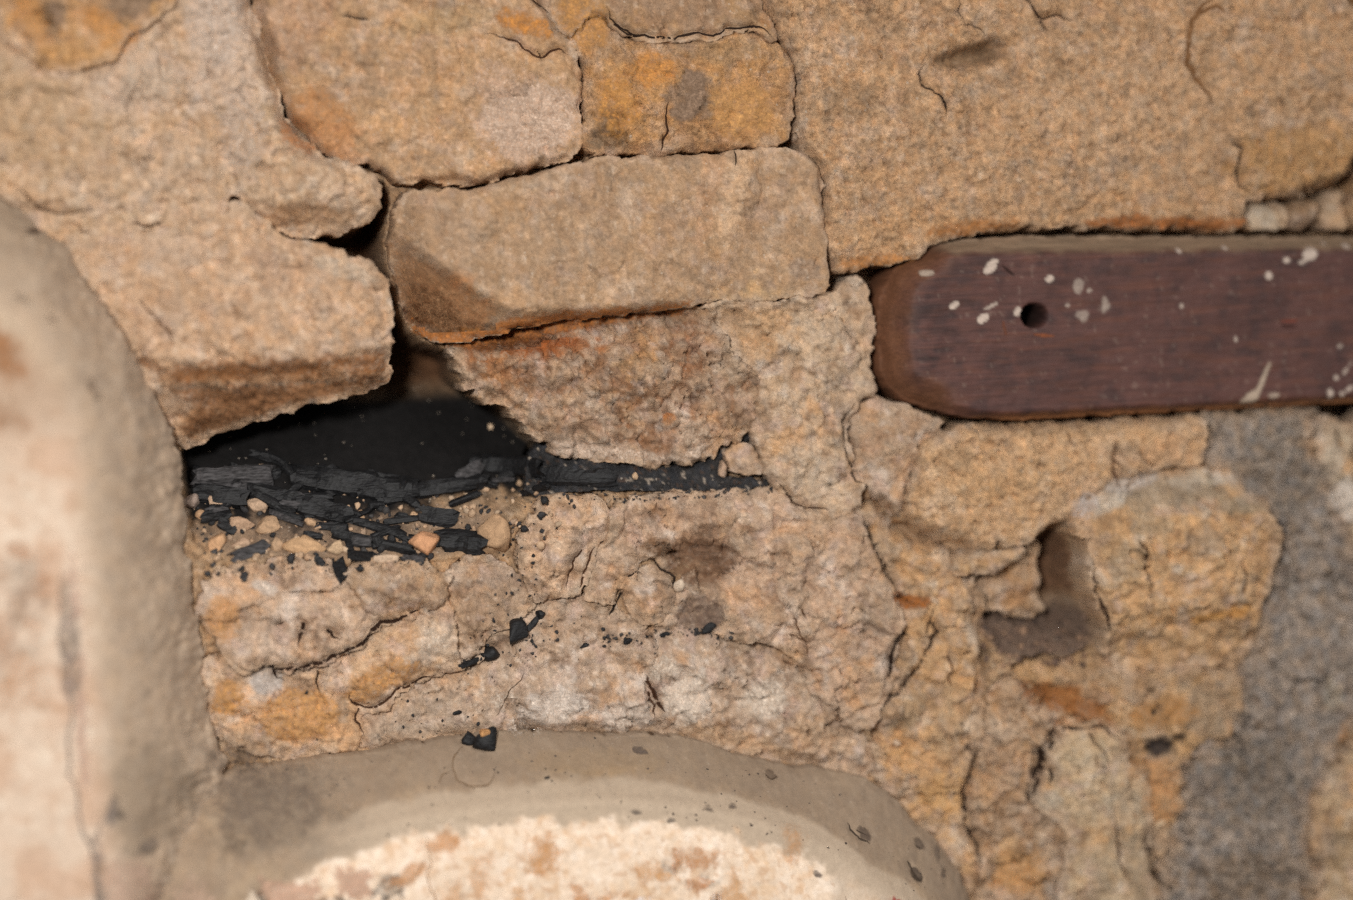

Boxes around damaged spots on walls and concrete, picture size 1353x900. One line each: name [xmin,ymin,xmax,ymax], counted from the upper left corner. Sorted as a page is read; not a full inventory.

spalling [443,305,760,471]
crack [57,563,113,900]
crack [235,606,434,737]